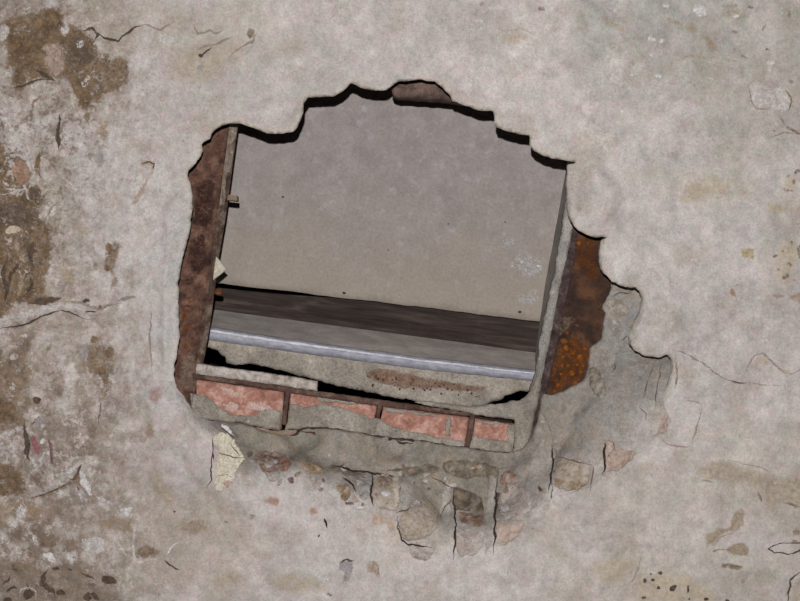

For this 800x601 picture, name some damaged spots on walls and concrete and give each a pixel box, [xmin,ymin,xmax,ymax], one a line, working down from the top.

corrosion [189,179,215,274]
corrosion [575,236,601,281]
crack [0,296,135,328]
spalling [147,280,672,561]
corrosion [366,369,486,397]
corrosion [549,331,589,394]
crack [662,350,798,448]
peeling [11,461,112,527]